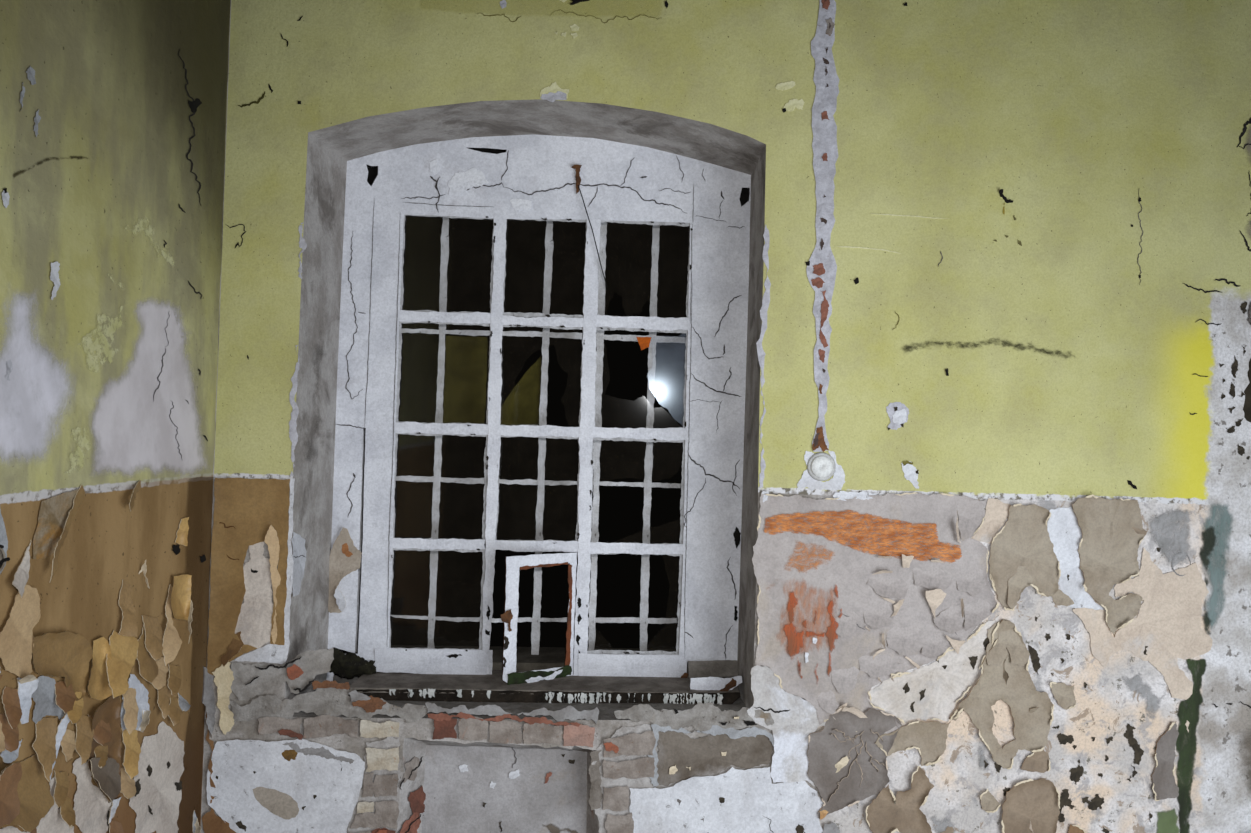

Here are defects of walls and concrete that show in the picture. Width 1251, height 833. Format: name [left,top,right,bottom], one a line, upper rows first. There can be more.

flaking render [821,0,835,88]
crack [178,50,202,213]
crack [401,151,745,228]
crack [336,236,366,429]
crack [690,295,742,431]
flaking render [0,296,426,833]
crack [346,473,356,516]
crack [684,452,740,530]
crack [724,527,741,660]
peeling [425,225,1179,833]
corrosion [764,510,962,680]
mould [1157,659,1206,833]